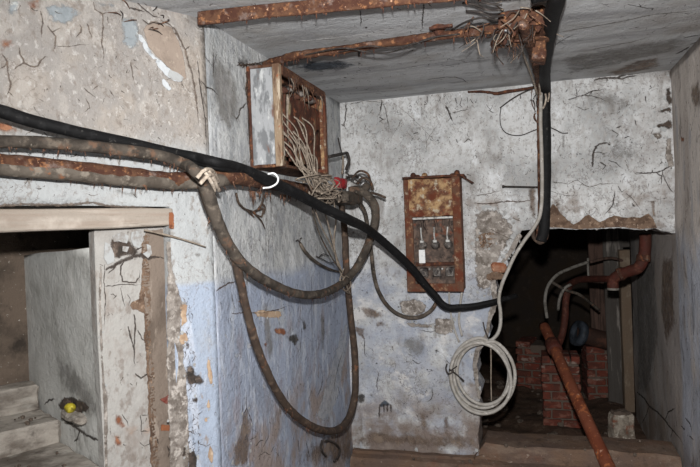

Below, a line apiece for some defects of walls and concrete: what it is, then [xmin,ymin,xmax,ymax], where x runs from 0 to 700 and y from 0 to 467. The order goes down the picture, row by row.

crack [2,2,107,96]
spalling [122,19,186,91]
crack [161,20,219,136]
crack [569,73,639,110]
crack [552,121,640,213]
spalling [550,203,657,231]
crack [640,166,673,192]
crack [104,247,164,379]
spalling [98,229,214,467]
spalling [470,204,522,401]
spalling [231,407,252,466]